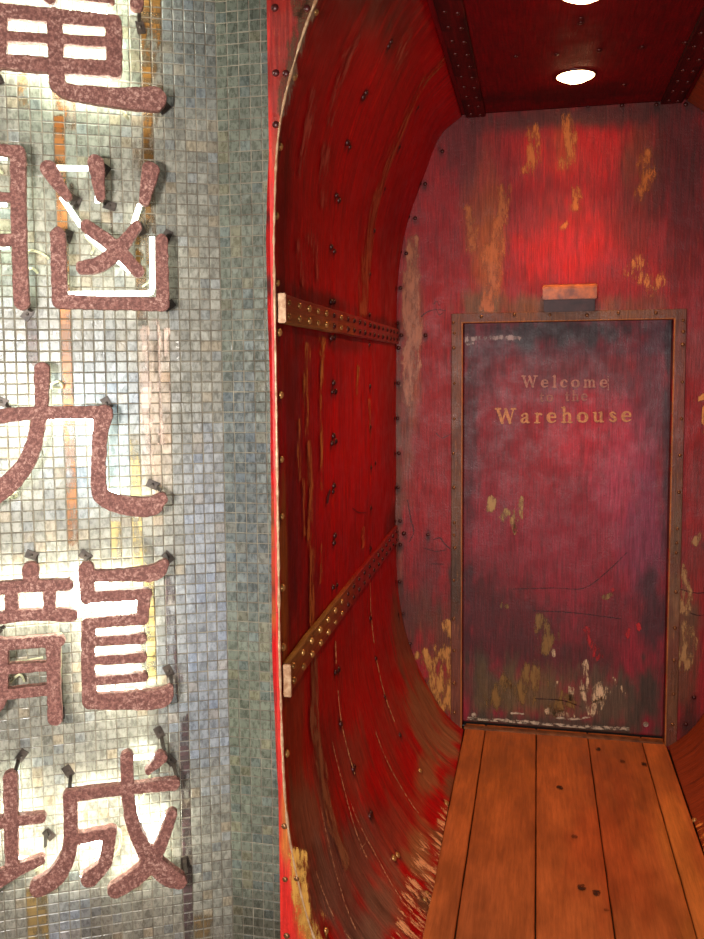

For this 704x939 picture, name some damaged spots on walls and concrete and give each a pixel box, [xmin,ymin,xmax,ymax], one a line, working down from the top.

rust [141,0,163,90]
rust [54,94,75,231]
rust [133,112,157,168]
peeling [522,123,541,175]
peeling [558,114,577,169]
rust [135,194,156,297]
peeling [624,255,665,292]
rust [60,309,73,406]
rust [64,420,78,546]
peeling [487,495,524,535]
peeling [486,612,626,718]
peeling [392,799,448,939]